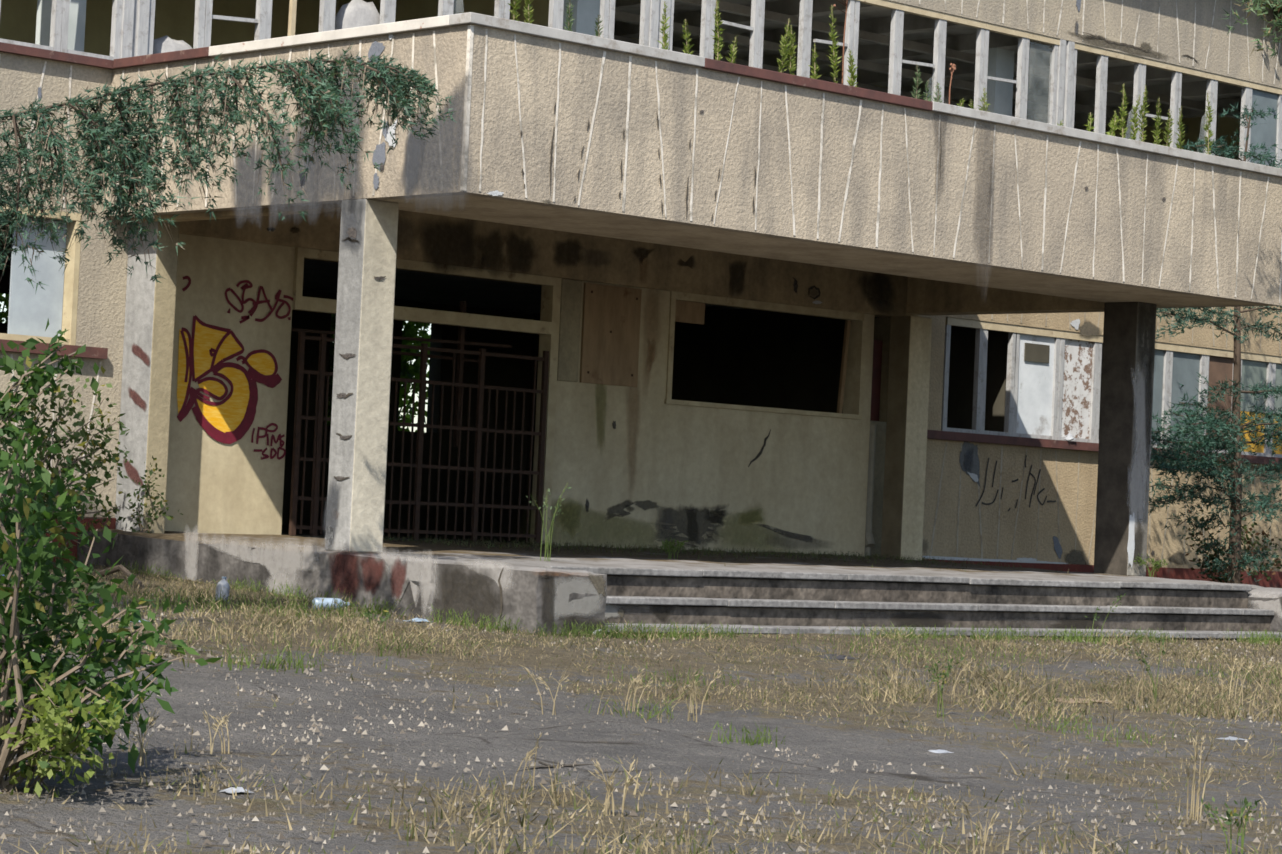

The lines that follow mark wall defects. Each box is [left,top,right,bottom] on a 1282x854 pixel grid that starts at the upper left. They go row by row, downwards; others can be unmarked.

leakage [424,224,533,271]
peeling [960,441,980,486]